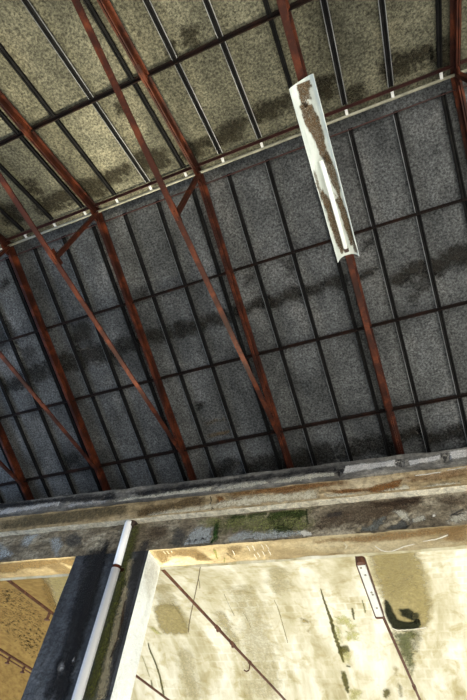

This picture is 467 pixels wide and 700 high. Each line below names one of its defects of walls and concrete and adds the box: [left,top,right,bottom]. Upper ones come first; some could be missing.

leakage [166,25,200,56]
leakage [315,75,365,103]
leakage [380,36,450,81]
leakage [179,94,291,161]
leakage [21,149,171,216]
corrosion [297,80,357,254]
leakage [390,245,467,300]
leakage [59,275,347,372]
leakage [316,485,425,530]
leakage [321,590,344,662]
leakage [371,544,430,671]